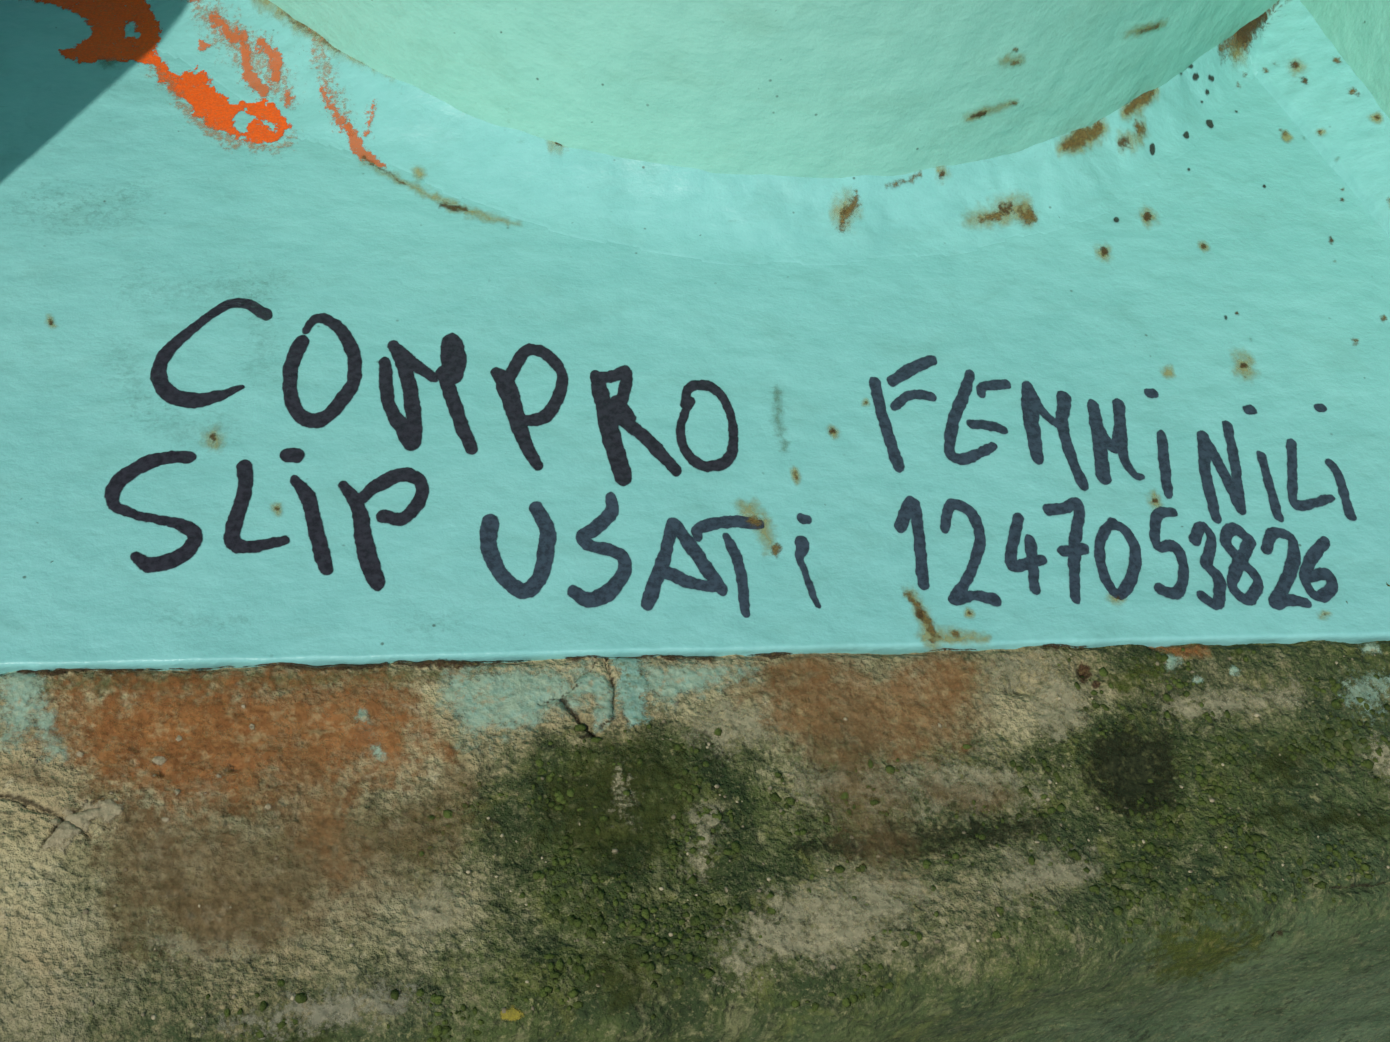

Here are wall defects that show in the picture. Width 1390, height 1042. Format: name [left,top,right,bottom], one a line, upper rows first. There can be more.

rust [1219,0,1279,58]
peeling [26,0,297,155]
rust [1059,120,1106,152]
rust [1118,88,1158,147]
rust [835,190,861,231]
rust [979,202,1036,224]
damp [576,657,774,762]
damp [1160,677,1305,720]
rust [33,667,454,856]
damp [680,804,724,881]
damp [707,746,1103,992]
damp [218,979,428,1042]